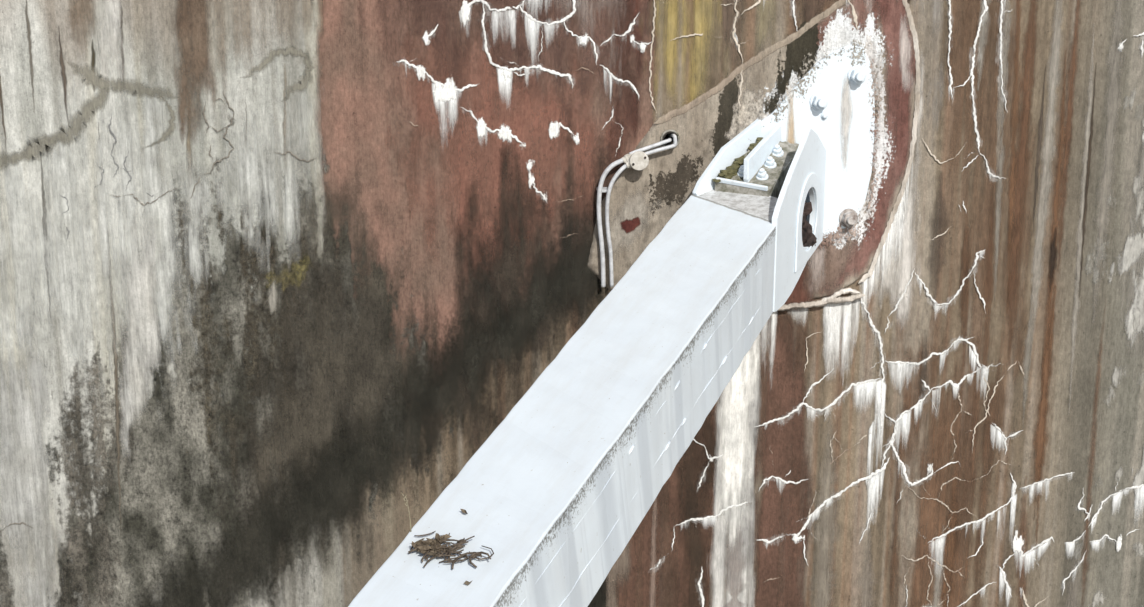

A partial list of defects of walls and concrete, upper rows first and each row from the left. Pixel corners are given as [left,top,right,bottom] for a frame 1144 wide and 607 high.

crack [275,151,315,162]
damp [0,0,604,607]
rust [317,0,656,372]
crack [399,0,703,202]
damp [679,311,777,607]
rust [751,0,916,607]
crack [650,250,1144,607]
crack [922,0,1012,179]
crack [1118,32,1144,55]